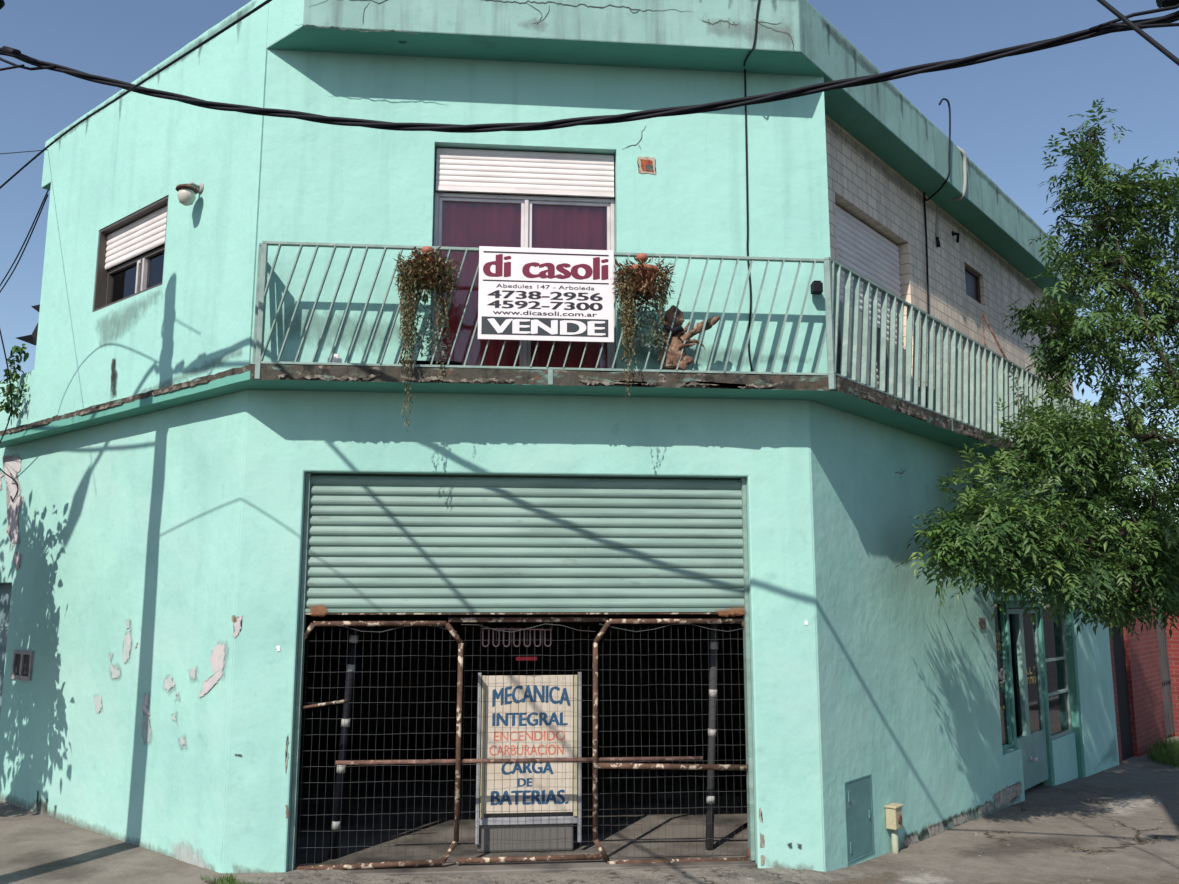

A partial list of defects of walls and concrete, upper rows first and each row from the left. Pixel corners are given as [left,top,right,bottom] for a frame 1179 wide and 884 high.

crack [298,0,417,34]
crack [486,0,794,50]
spalling [278,372,379,381]
spalling [680,381,778,389]
peeling [0,455,24,570]
peeling [108,620,138,679]
peeling [189,615,243,697]
peeling [141,693,151,743]
flaking render [993,782,1022,810]